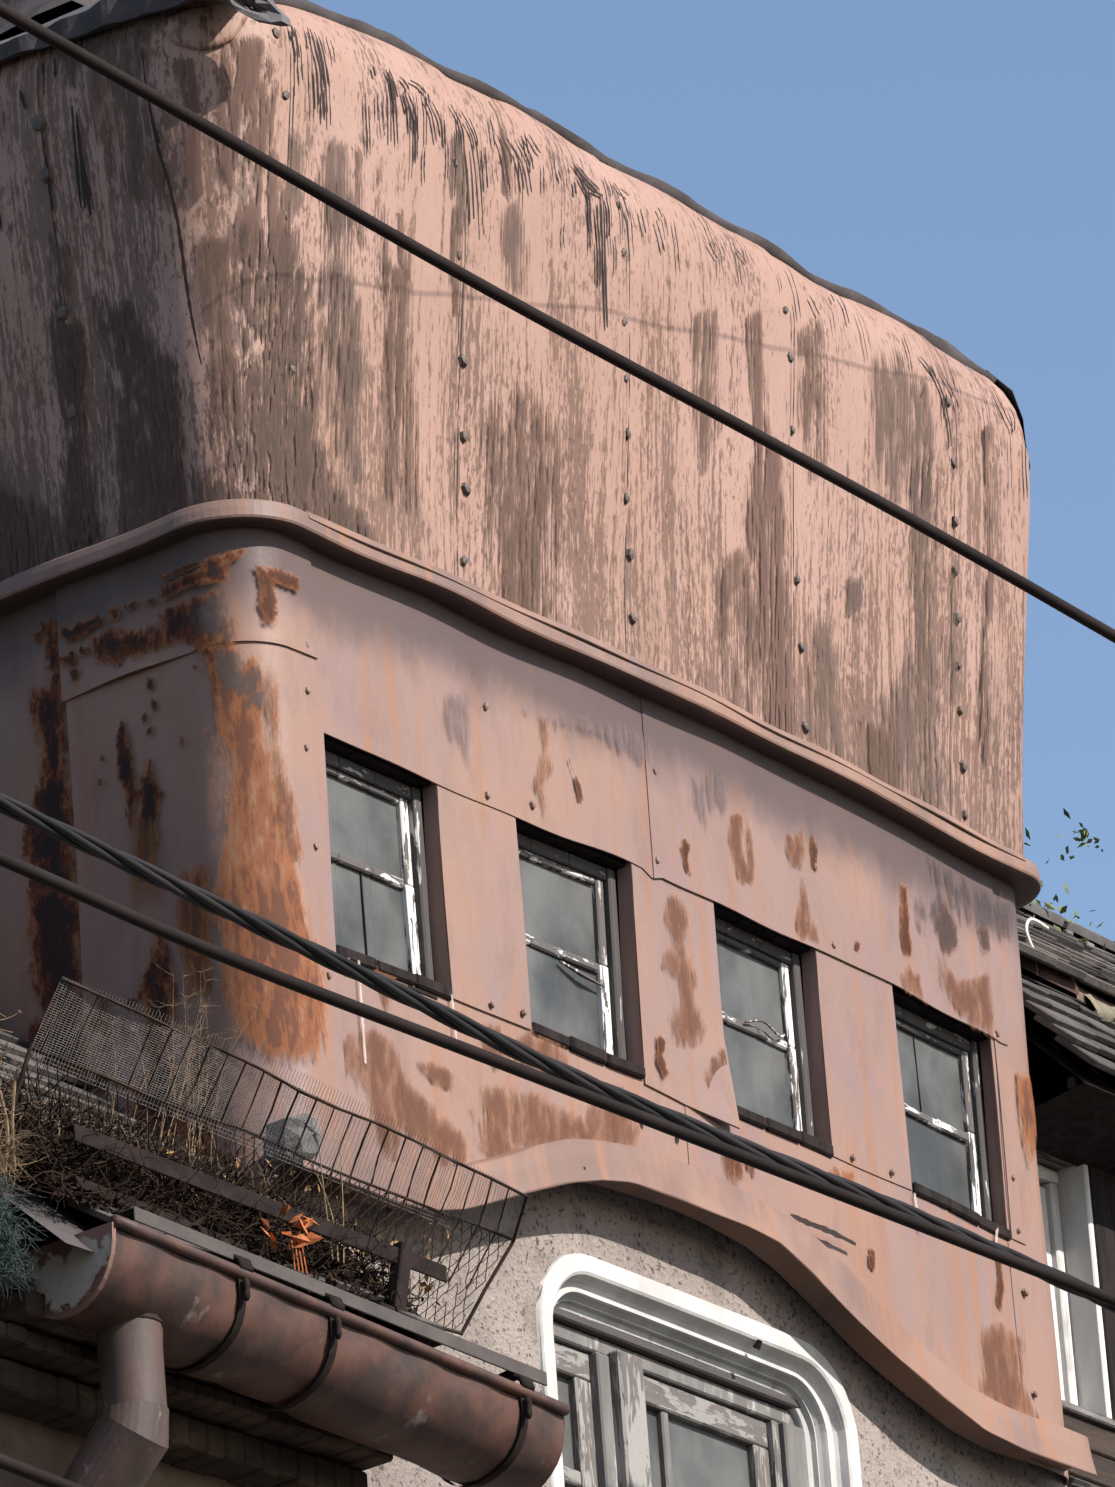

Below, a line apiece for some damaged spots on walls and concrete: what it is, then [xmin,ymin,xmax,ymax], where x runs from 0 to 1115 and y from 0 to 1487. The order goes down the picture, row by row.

crack [141,47,202,365]
water stain [0,8,420,581]
water stain [491,98,531,300]
water stain [482,386,568,623]
water stain [719,308,845,759]
water stain [863,349,961,810]
rust [22,549,467,1163]
rust [900,885,923,996]
rust [937,905,993,1031]
rust [485,1086,639,1157]
rust [1017,1073,1037,1167]
peeling [26,1233,112,1311]